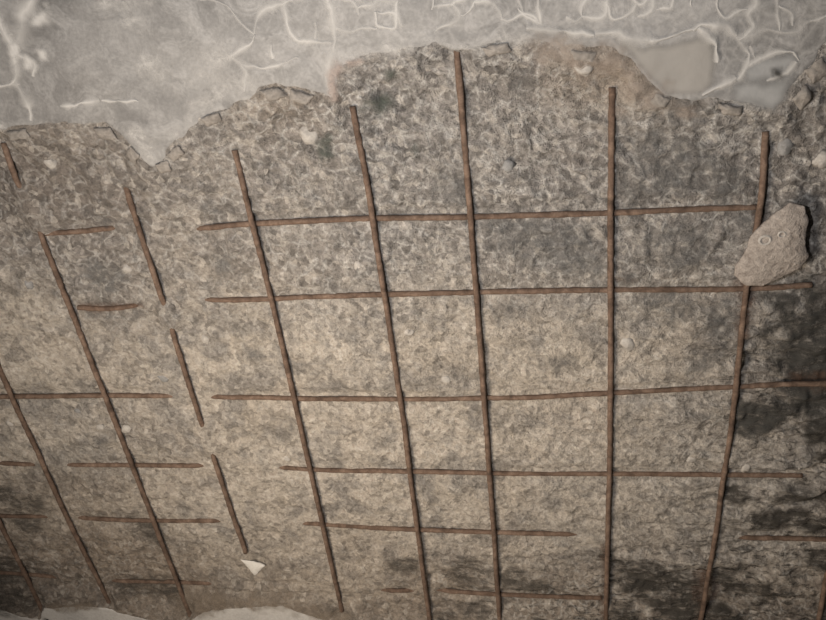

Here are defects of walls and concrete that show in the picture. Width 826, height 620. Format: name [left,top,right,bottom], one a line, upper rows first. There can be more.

crack [0,0,37,121]
crack [221,0,401,97]
crack [566,0,692,20]
crack [715,0,826,90]
spalling [231,150,415,613]
spalling [349,106,498,620]
spalling [453,50,608,620]
spalling [604,87,757,620]
damp [736,276,826,444]
damp [749,492,826,533]
damp [598,554,742,620]
damp [703,567,786,605]